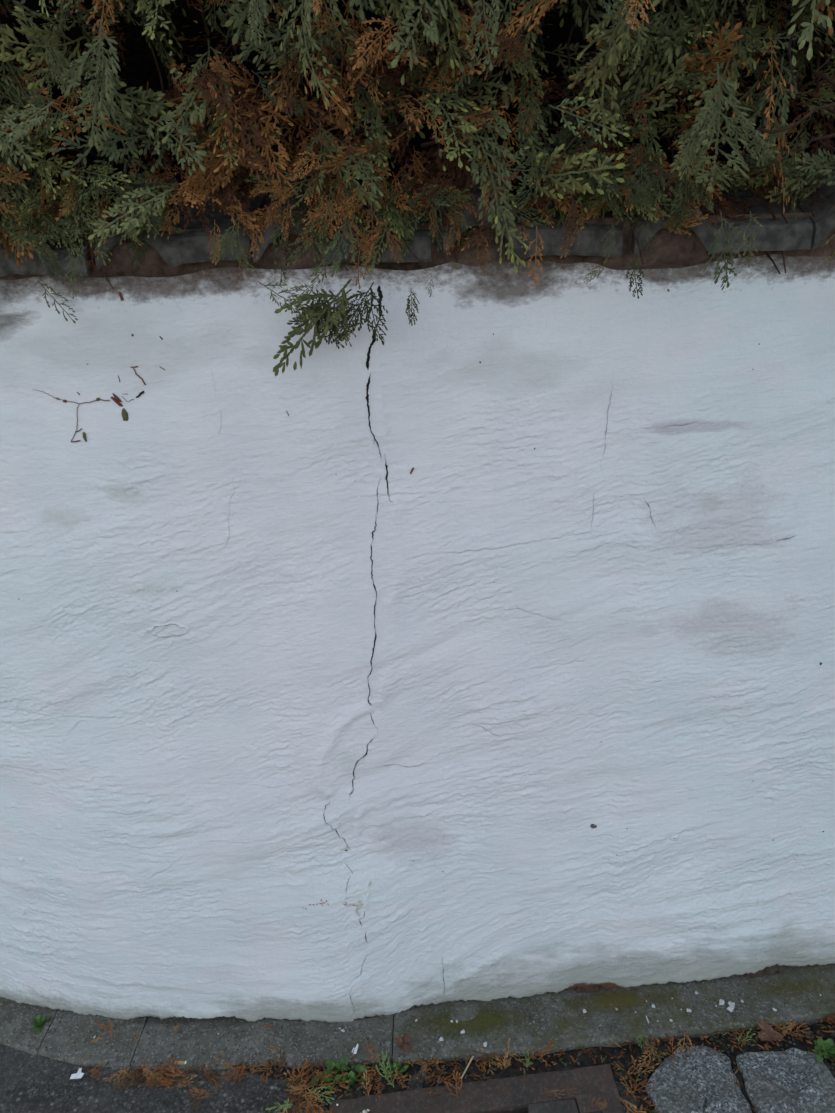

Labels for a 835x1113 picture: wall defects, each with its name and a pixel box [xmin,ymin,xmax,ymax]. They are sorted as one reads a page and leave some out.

crack [323,285,430,890]